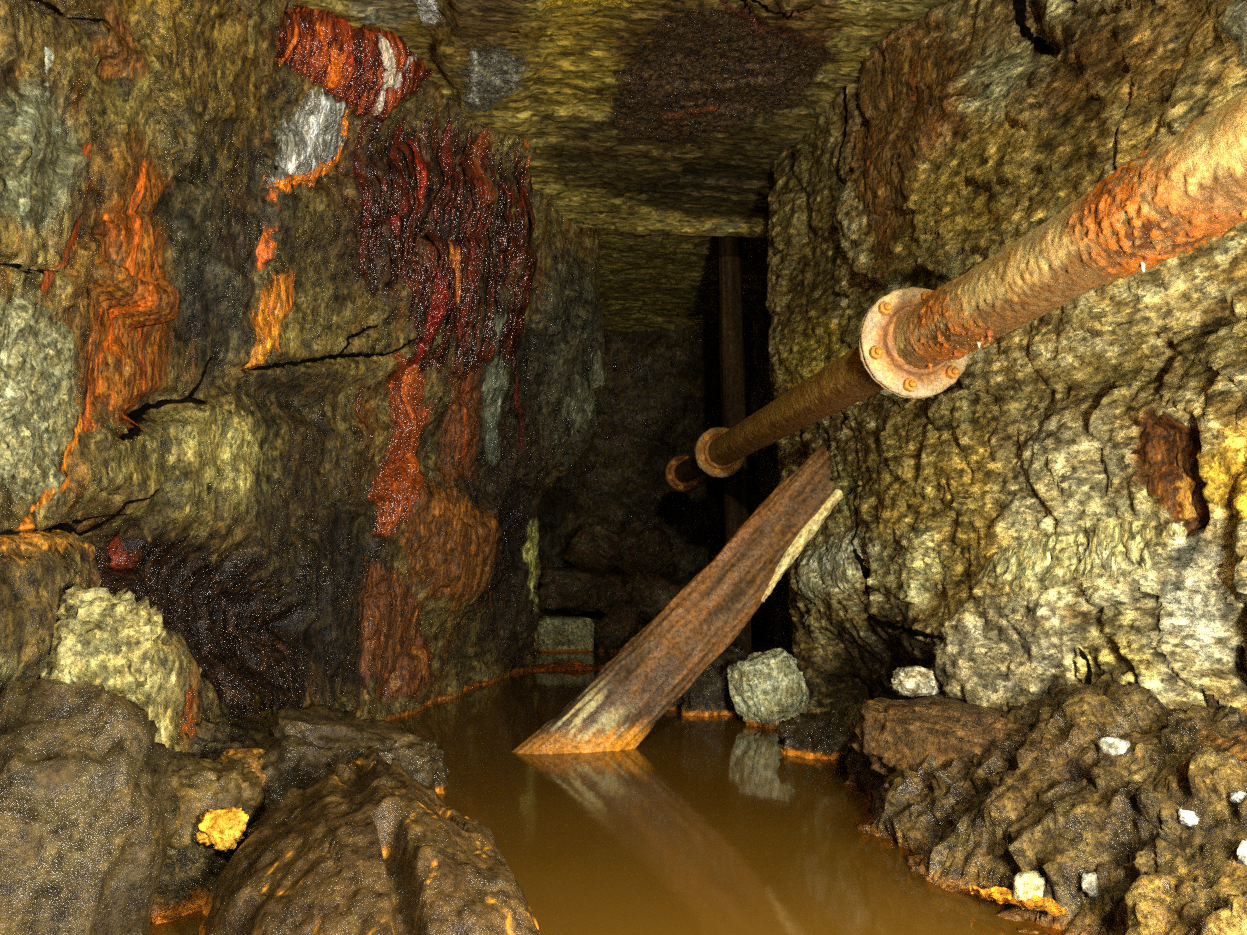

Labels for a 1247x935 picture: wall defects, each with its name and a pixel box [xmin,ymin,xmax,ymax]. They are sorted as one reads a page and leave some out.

crack [1013,0,1054,55]
corrosion [268,187,279,208]
corrosion [242,226,296,369]
corrosion [352,109,538,538]
crack [1239,645,1247,674]